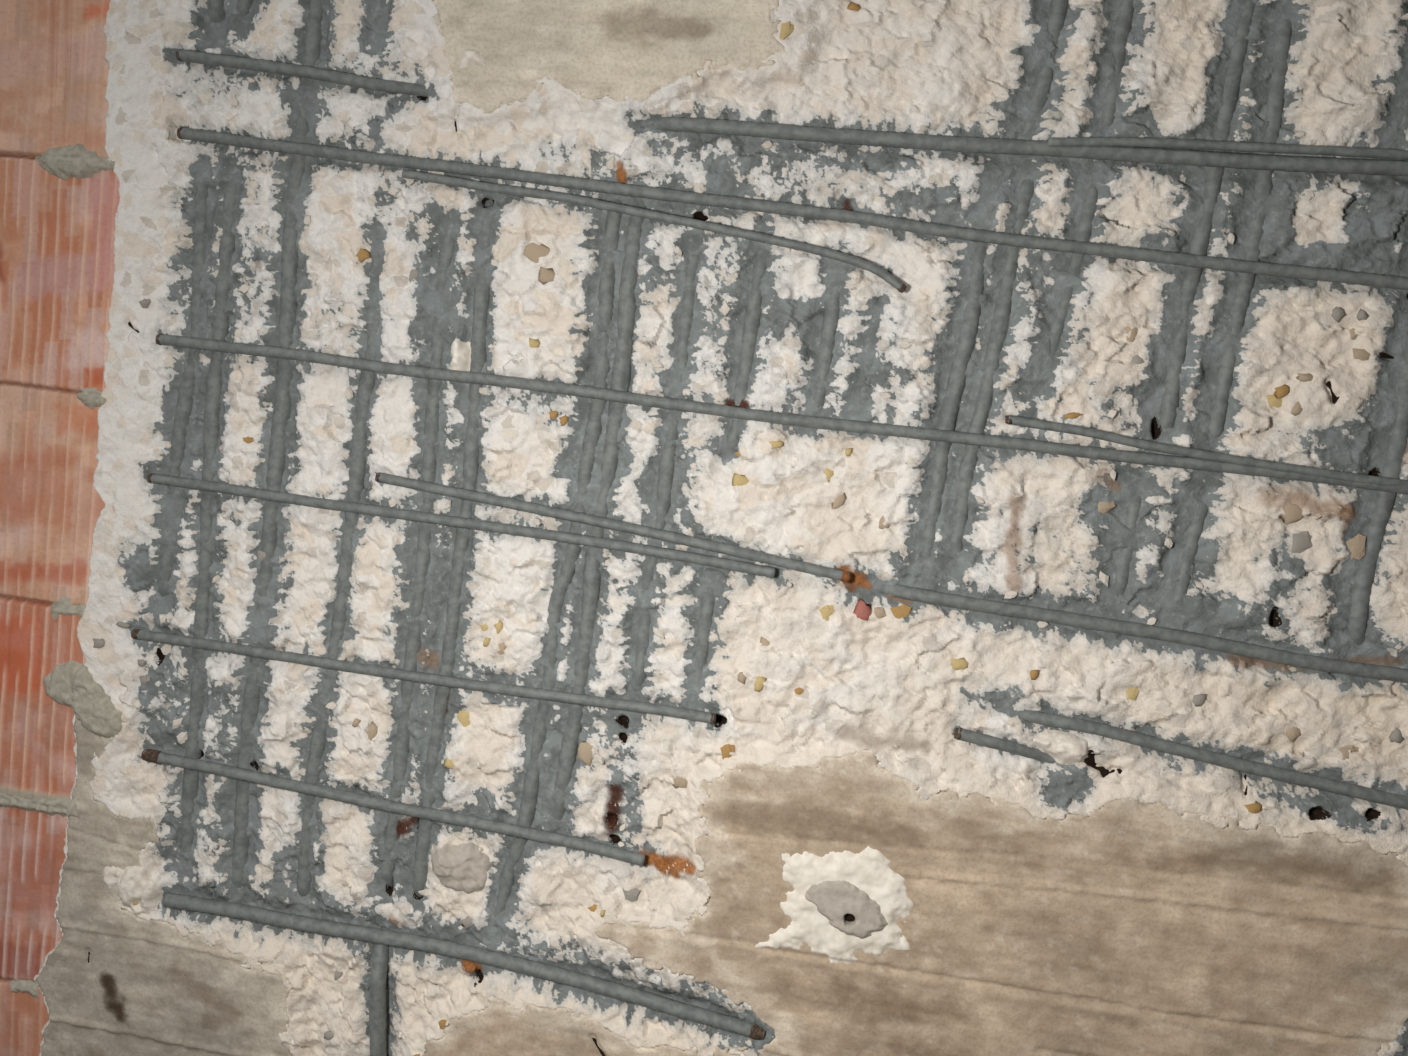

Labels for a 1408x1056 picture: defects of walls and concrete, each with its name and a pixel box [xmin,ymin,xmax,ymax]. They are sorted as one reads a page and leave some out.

spalling [176,49,427,97]
spalling [640,117,1408,176]
spalling [177,127,1408,486]
spalling [155,334,1408,583]
spalling [147,473,775,695]
corrosion [839,566,870,590]
spalling [877,584,1408,683]
spalling [141,749,645,866]
spalling [131,629,716,828]
corrosion [640,851,695,878]
spalling [1018,710,1408,810]
spalling [163,893,766,1056]